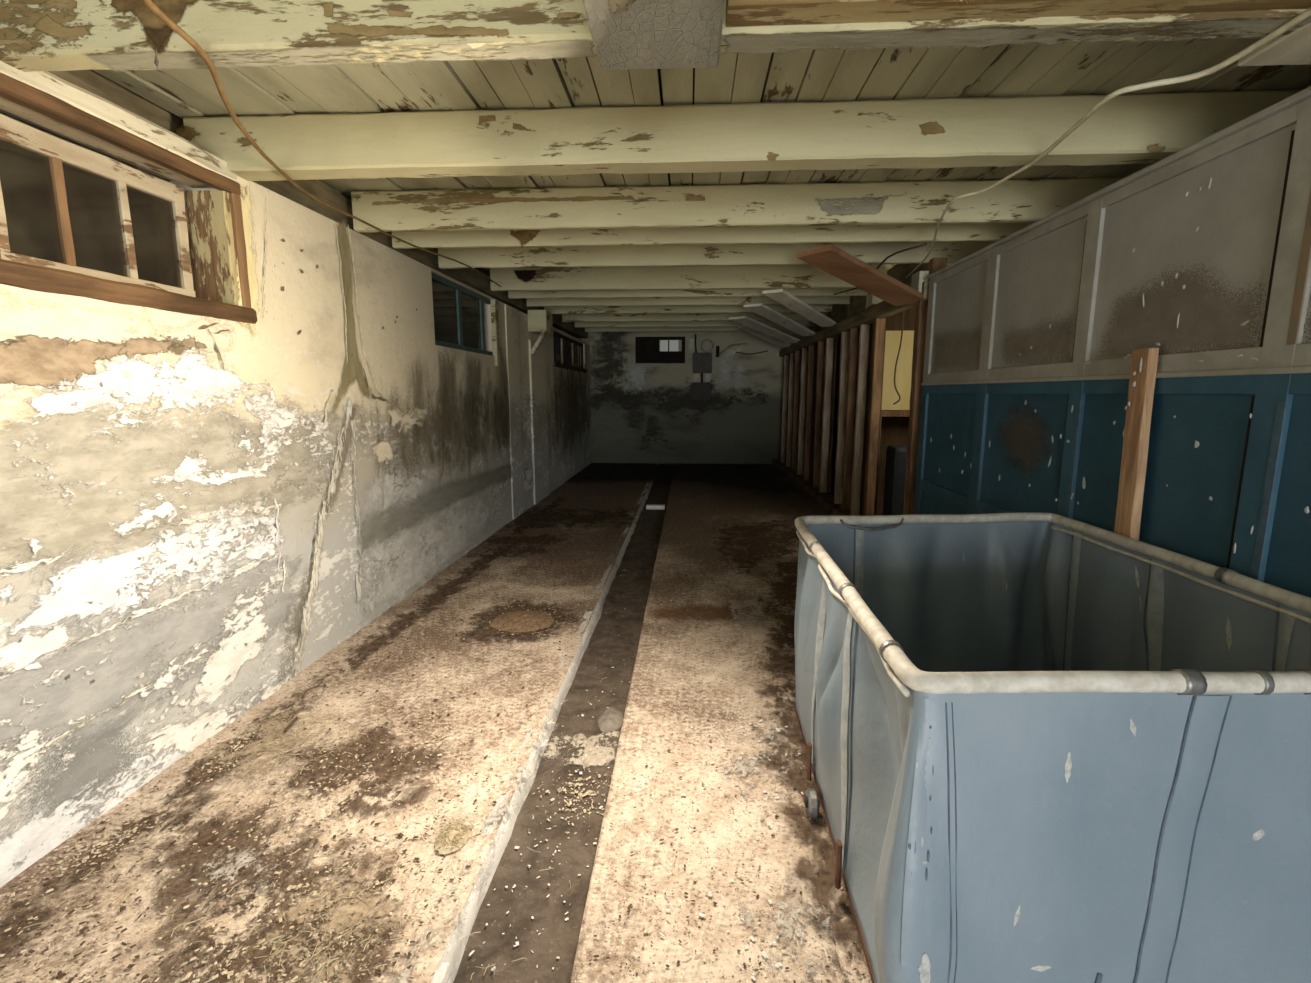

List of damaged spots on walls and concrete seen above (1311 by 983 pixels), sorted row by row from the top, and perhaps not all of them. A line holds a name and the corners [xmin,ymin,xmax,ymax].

peeling [0,0,595,70]
peeling [725,17,1311,54]
peeling [171,123,200,141]
peeling [372,196,634,205]
peeling [819,197,888,215]
peeling [919,121,945,135]
crack [278,221,391,684]
damp [357,346,528,553]
damp [547,332,814,501]
peeling [0,334,339,760]
damp [485,700,620,843]
damp [641,520,866,983]